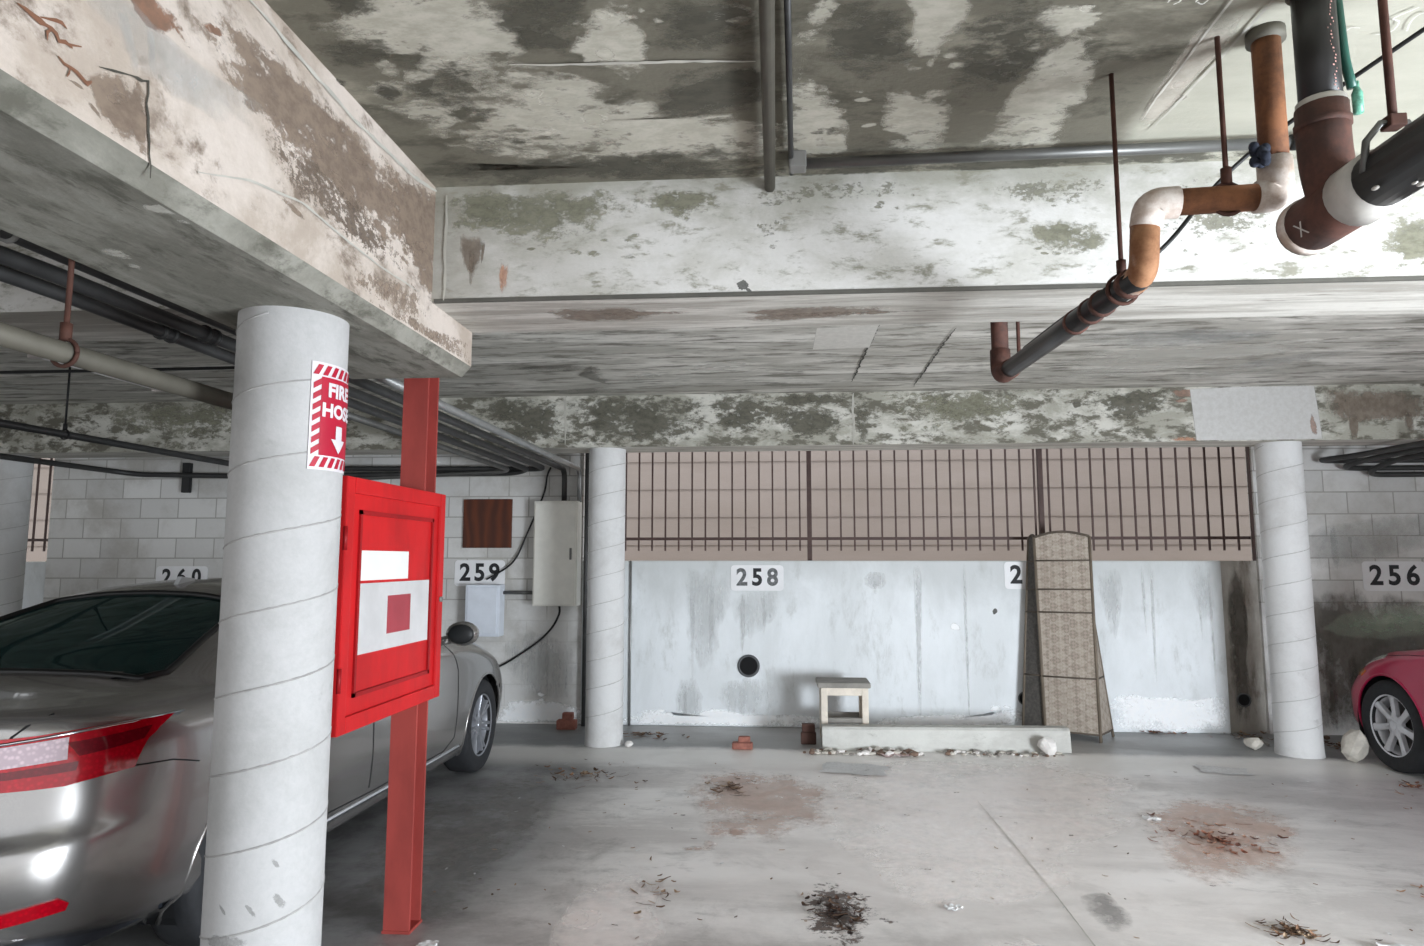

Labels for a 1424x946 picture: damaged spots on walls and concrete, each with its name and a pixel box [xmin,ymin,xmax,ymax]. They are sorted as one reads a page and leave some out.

water stain [489,0,586,53]
water stain [951,0,1057,90]
crack [17,2,152,178]
peeling [70,73,148,156]
water stain [374,57,492,122]
water stain [653,67,762,118]
peeling [131,0,468,359]
water stain [446,138,1249,283]
water stain [1164,212,1270,256]
water stain [482,365,871,444]
water stain [890,392,1024,432]
water stain [1314,595,1424,724]